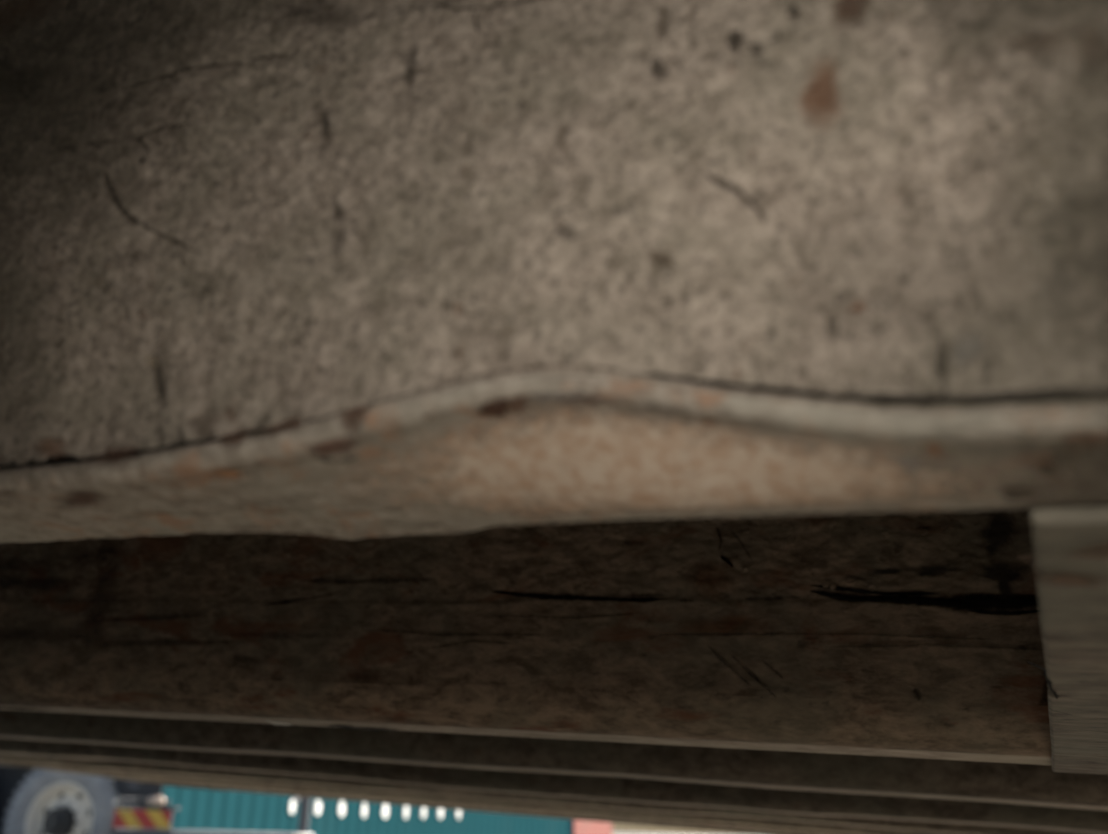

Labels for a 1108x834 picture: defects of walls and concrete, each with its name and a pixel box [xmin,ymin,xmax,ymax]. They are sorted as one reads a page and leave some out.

crack [490,591,694,603]
crack [746,585,1040,616]